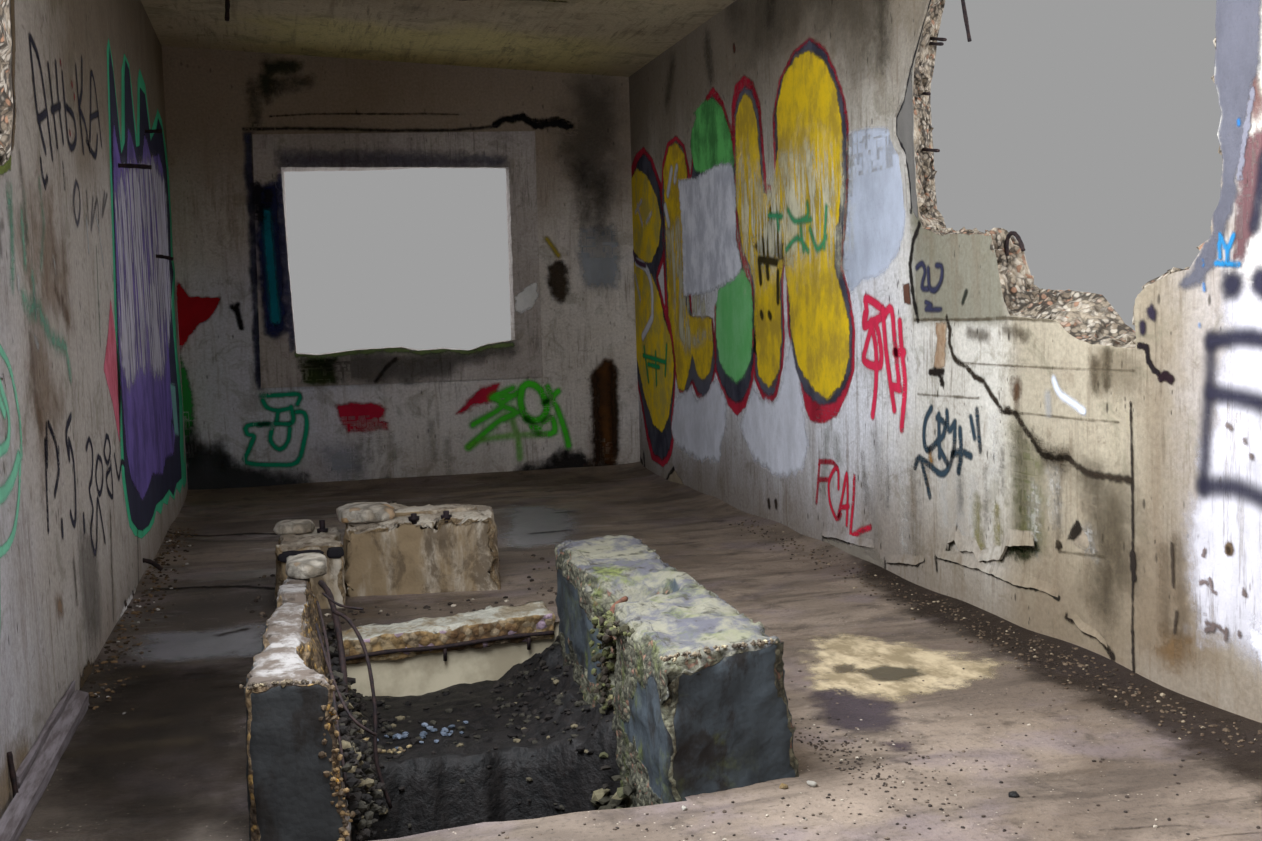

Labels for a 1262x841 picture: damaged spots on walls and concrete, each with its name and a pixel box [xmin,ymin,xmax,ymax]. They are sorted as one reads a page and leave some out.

spalling [0,0,16,175]
peeling [889,0,931,324]
spalling [1181,0,1262,288]
spalling [928,322,947,386]
crack [1131,342,1174,385]
crack [914,314,1136,672]
crack [1170,543,1178,633]